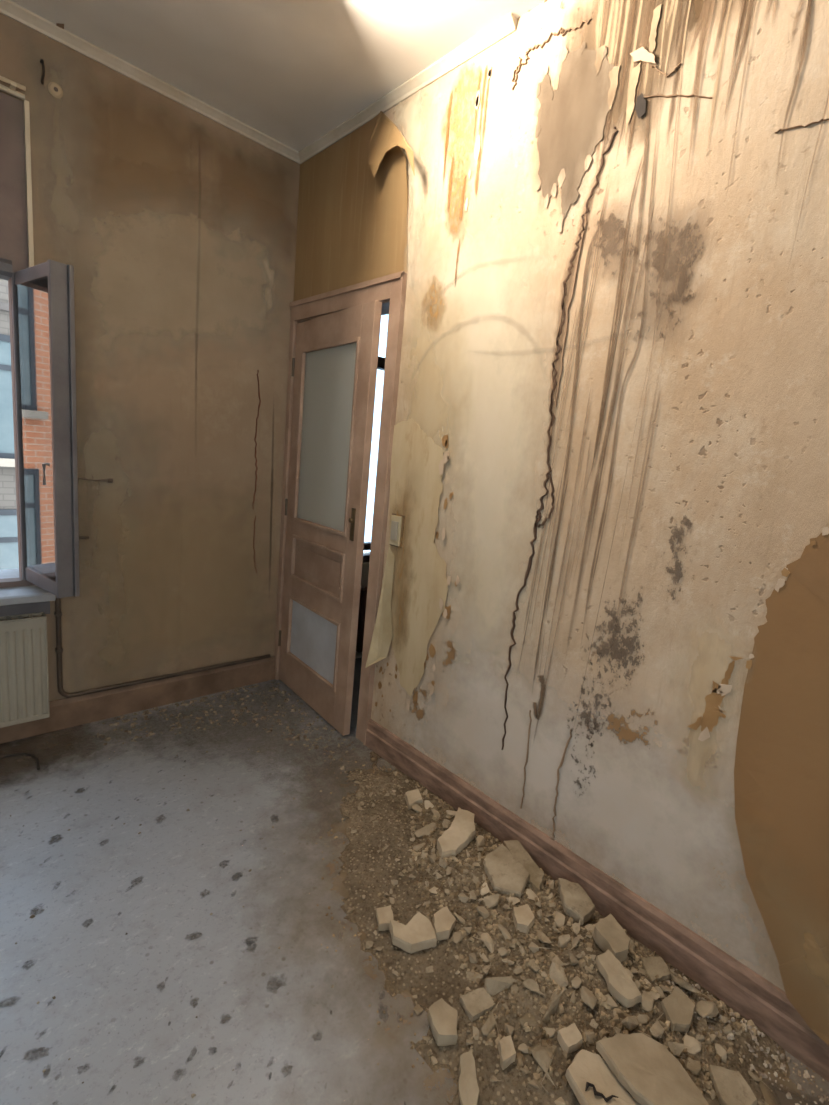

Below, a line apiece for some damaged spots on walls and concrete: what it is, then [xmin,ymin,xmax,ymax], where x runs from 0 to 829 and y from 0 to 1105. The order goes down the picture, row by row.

water stain [782,0,812,136]
water stain [424,0,776,913]
water stain [411,688,428,720]
peeling [687,654,754,741]